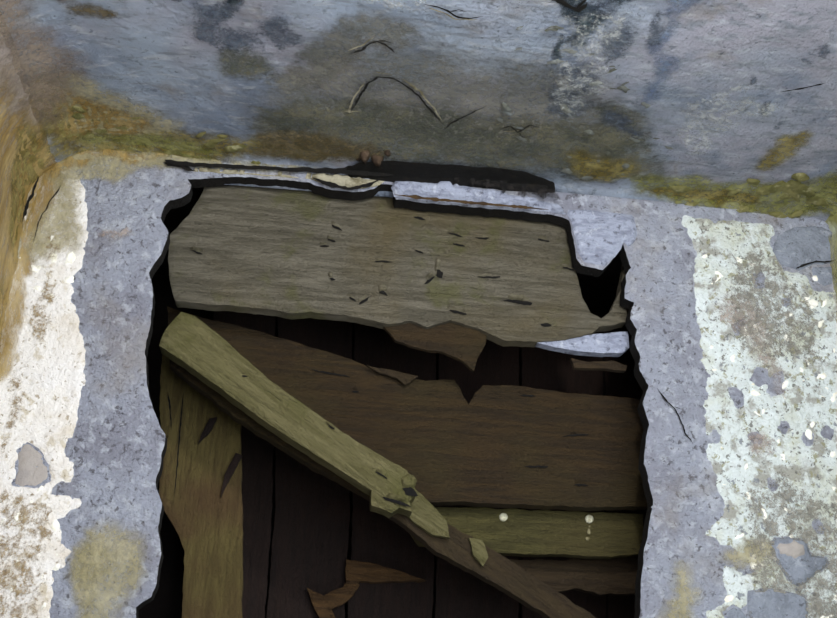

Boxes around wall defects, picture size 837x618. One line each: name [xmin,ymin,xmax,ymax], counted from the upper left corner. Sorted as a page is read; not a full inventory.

leakage [60,0,116,19]
crack [348,37,395,54]
crack [345,72,484,129]
leakage [193,0,665,182]
flaking render [589,66,630,93]
crack [17,176,61,258]
leakage [0,0,81,378]
leakage [470,178,560,199]
flaking render [567,210,637,266]
crack [658,390,692,442]
spalling [383,487,418,507]
leakage [74,525,142,618]